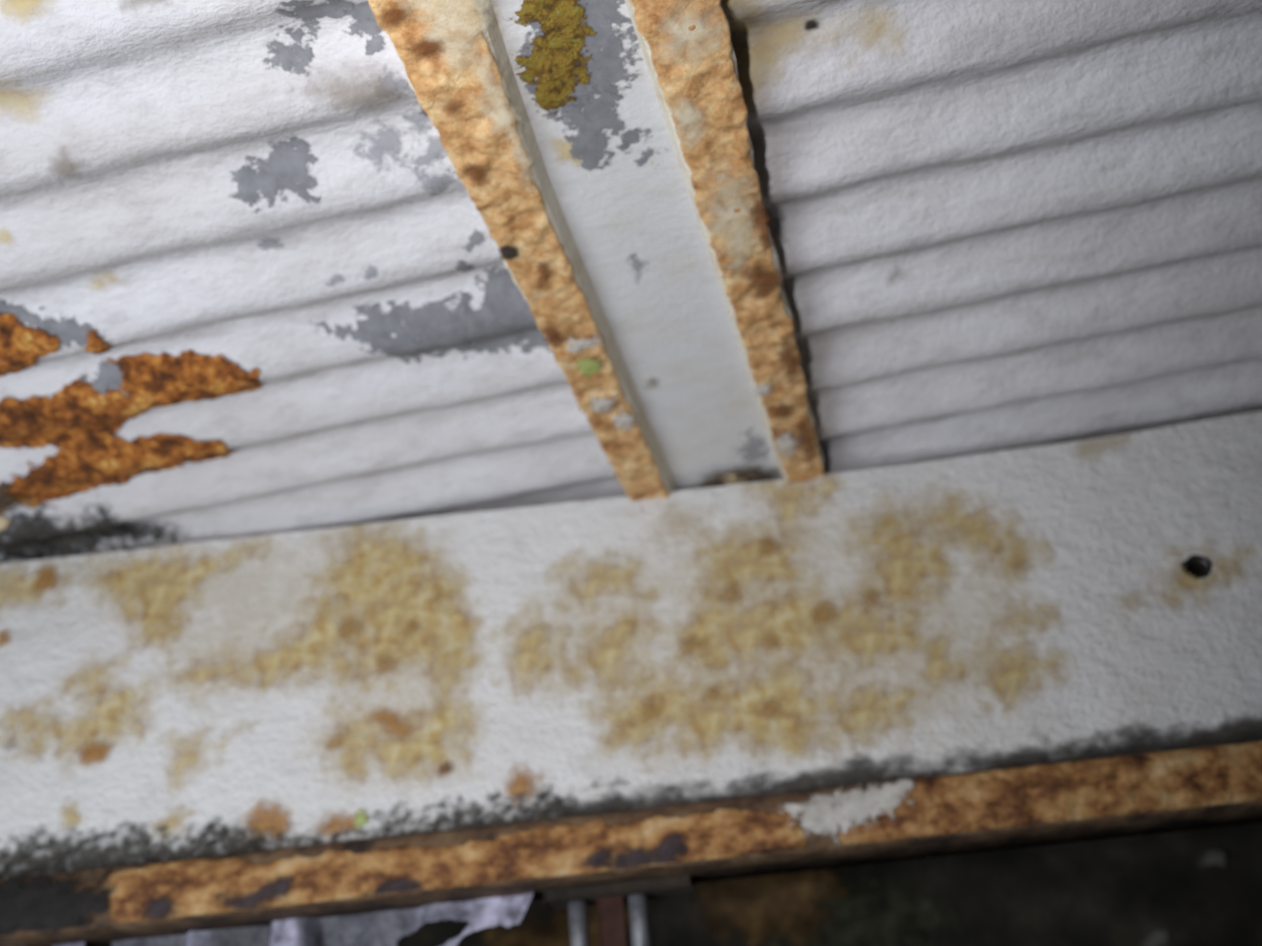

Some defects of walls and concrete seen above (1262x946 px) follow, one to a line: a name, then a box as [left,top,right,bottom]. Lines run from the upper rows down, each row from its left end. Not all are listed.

peeling [264,0,385,75]
peeling [230,137,321,213]
peeling [360,112,454,196]
peeling [258,239,283,250]
peeling [315,229,552,364]
corrosion [368,0,823,502]
corrosion [0,300,262,530]
corrosion [507,774,533,798]
damp [0,718,1262,879]
peeling [784,779,914,841]
corrosion [838,741,1262,845]
corrosion [75,803,806,923]